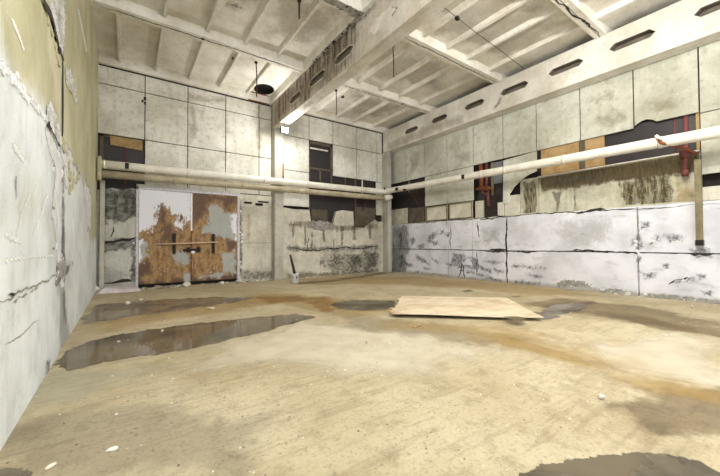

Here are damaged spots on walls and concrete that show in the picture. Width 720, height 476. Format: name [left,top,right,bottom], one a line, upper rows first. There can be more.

crack [555,0,599,35]
flaking render [43,0,78,103]
peeling [0,60,91,287]
damp [540,154,699,206]
damp [99,187,136,223]
spalling [308,220,333,231]
damp [321,247,379,273]
damp [393,227,410,272]
crack [289,204,715,283]
crack [0,274,57,303]